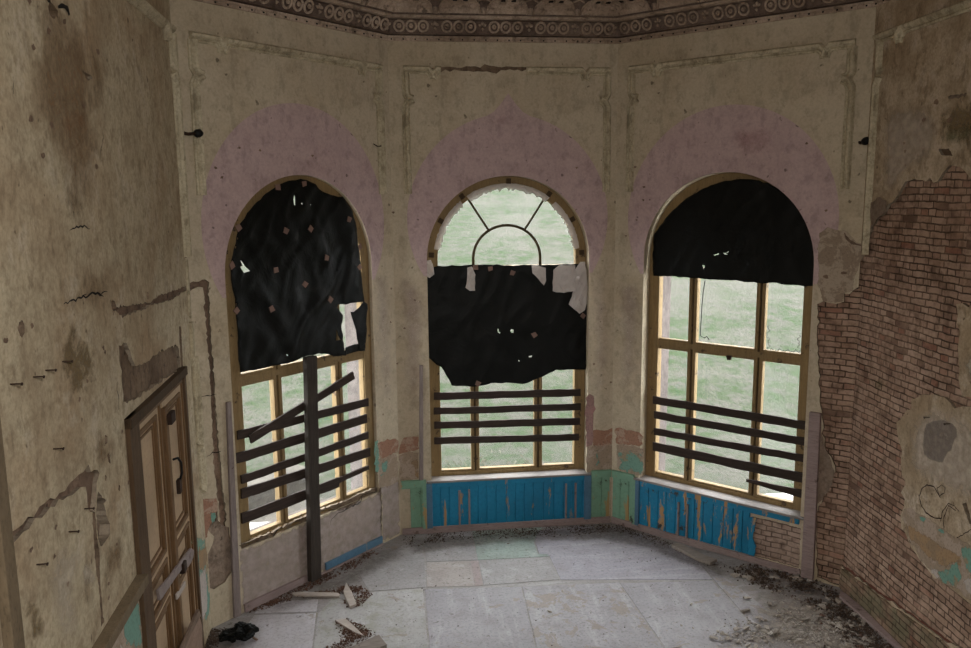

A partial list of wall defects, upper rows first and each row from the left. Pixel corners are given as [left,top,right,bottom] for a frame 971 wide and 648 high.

crack [64,291,107,304]
peeling [320,436,419,512]
peeling [584,394,645,475]
flaking render [816,148,971,648]